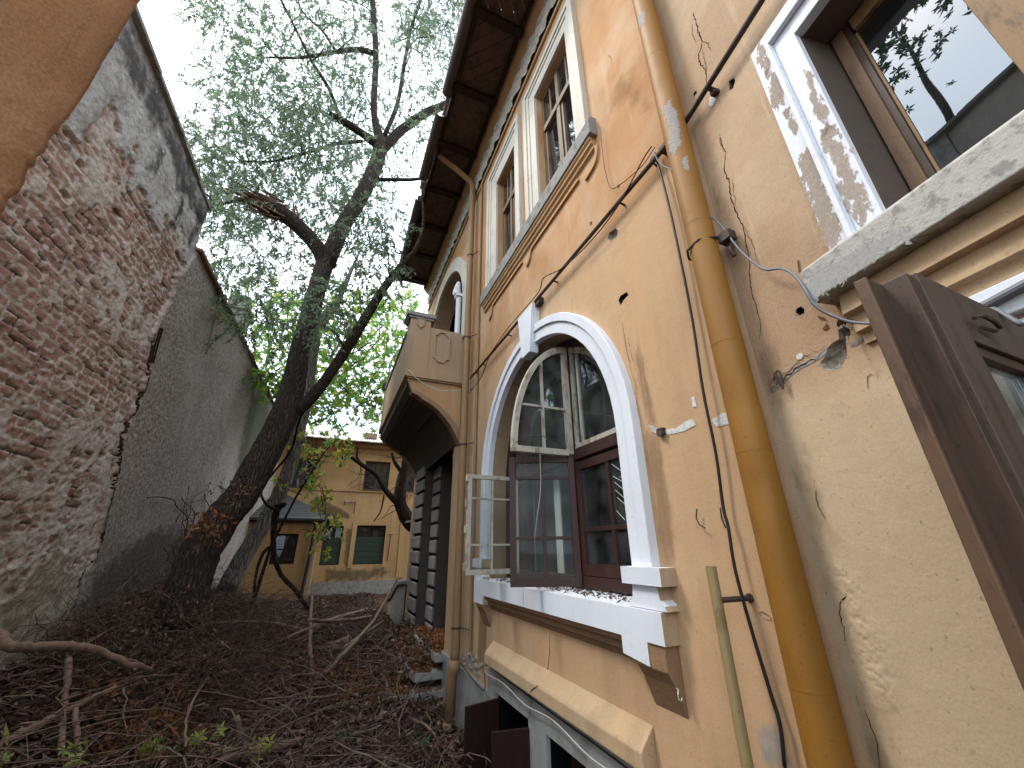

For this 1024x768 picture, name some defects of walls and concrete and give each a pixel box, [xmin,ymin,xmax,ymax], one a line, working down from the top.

peeling [662,98,690,171]
crack [692,14,710,83]
crack [719,134,761,339]
peeling [756,39,914,392]
spalling [148,327,163,363]
crack [77,334,156,588]